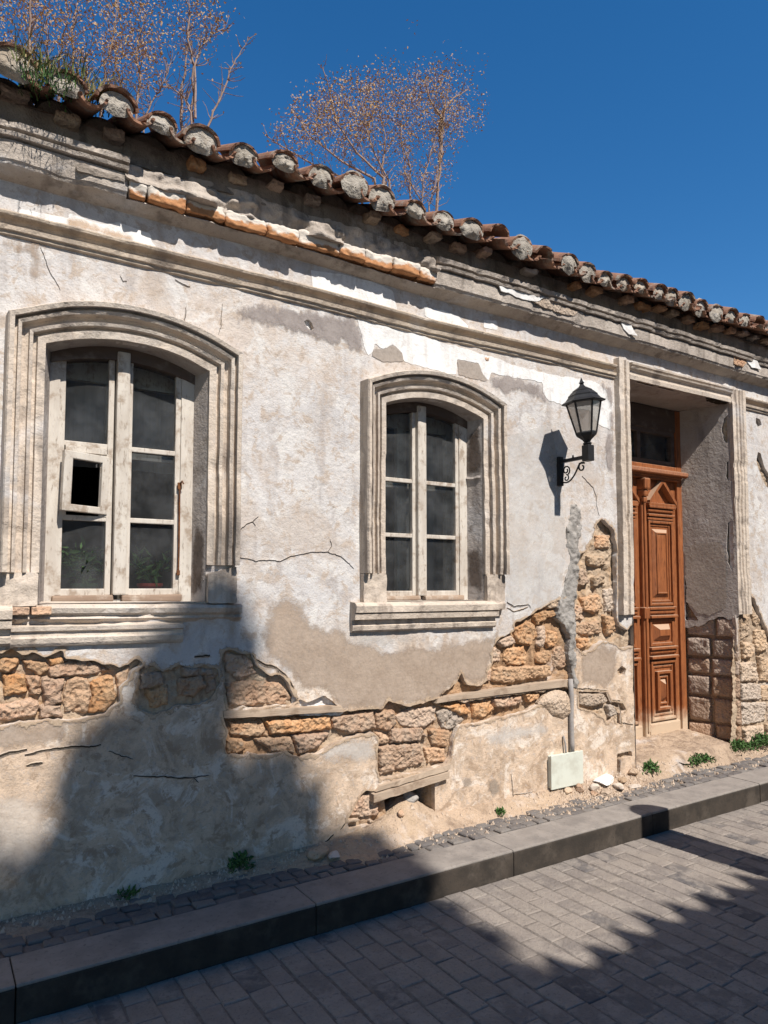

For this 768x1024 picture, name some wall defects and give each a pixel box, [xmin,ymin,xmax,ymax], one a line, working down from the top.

peeling [76,163,437,309]
peeling [357,319,613,430]
crack [240,541,354,569]
peeling [0,518,633,826]
spalling [730,594,768,743]
crack [0,743,209,783]